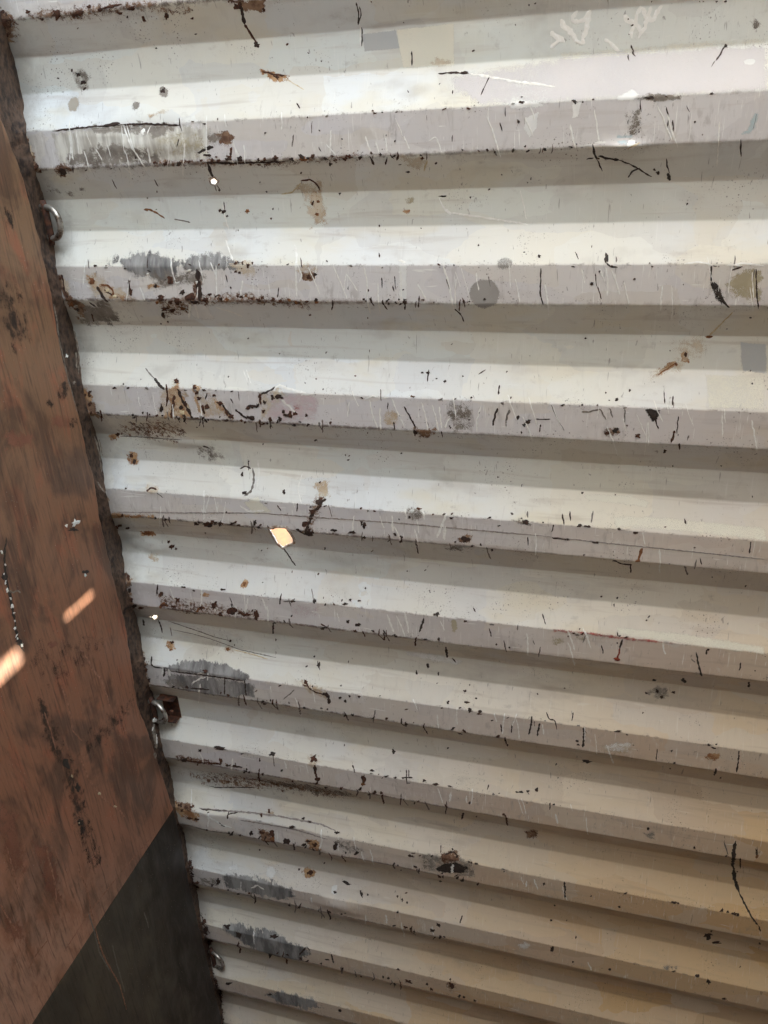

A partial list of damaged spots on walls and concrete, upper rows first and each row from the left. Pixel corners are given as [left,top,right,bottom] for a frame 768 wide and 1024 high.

corrosion [228,0,266,48]
corrosion [259,69,304,90]
corrosion [153,130,362,169]
corrosion [282,179,330,229]
corrosion [145,368,317,423]
corrosion [153,586,260,621]
spalling [220,685,306,715]